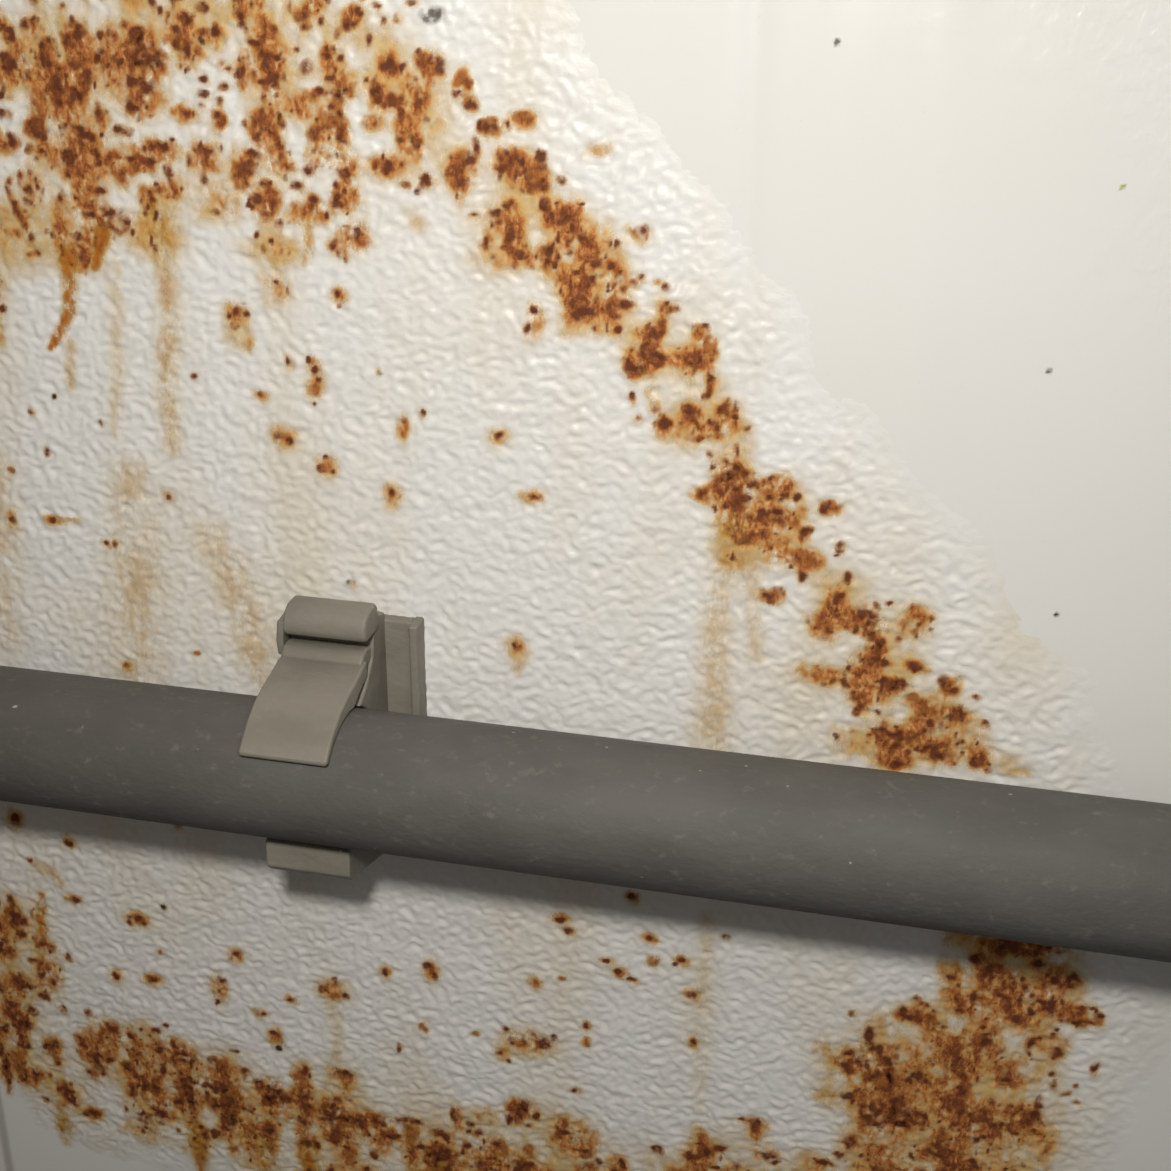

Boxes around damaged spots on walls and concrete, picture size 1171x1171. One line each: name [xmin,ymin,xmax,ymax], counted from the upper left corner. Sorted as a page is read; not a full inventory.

corrosion [0,0,1029,775]
corrosion [8,810,23,828]
corrosion [625,891,639,904]
corrosion [641,933,690,967]
corrosion [600,958,638,984]
corrosion [683,988,700,1001]
corrosion [0,893,630,1171]
corrosion [793,932,1105,1171]
corrosion [651,1116,781,1171]